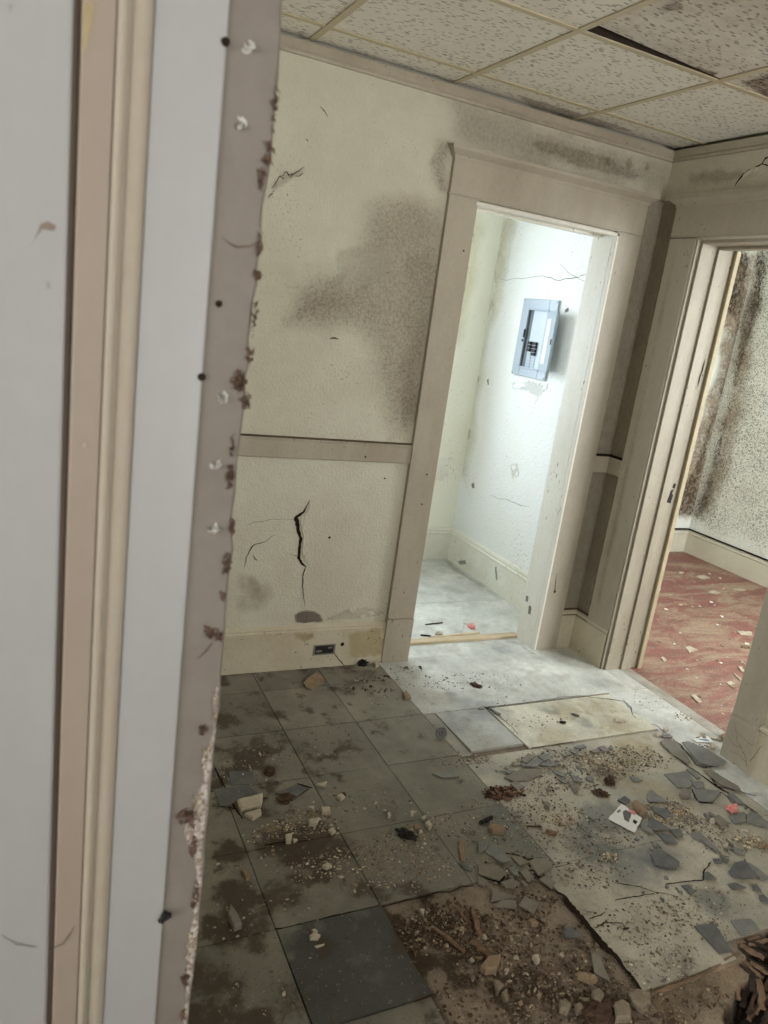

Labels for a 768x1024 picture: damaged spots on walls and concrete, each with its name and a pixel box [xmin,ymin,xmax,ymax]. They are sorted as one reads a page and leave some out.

peeling [254,233,263,281]
peeling [245,300,259,364]
water stain [679,251,768,547]
crack [244,502,311,602]
peeling [198,692,218,775]
peeling [176,806,197,858]
peeling [180,932,193,990]